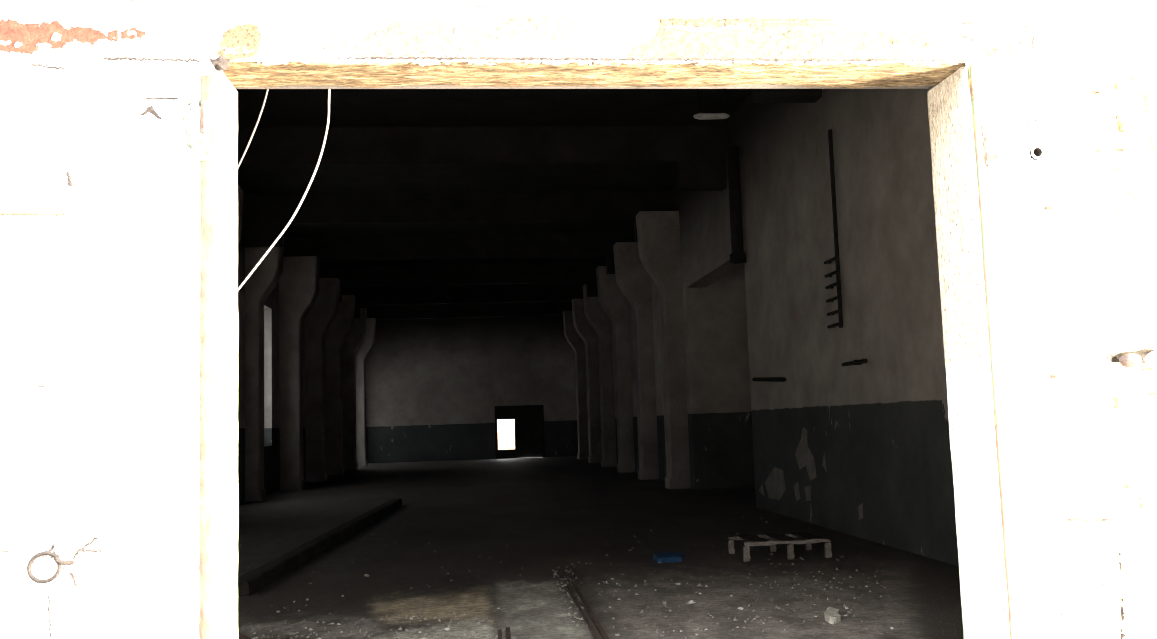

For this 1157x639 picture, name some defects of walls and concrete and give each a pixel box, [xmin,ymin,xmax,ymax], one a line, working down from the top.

peeling [210,14,969,72]
crack [264,21,977,62]
peeling [140,106,162,120]
spalling [1029,145,1044,159]